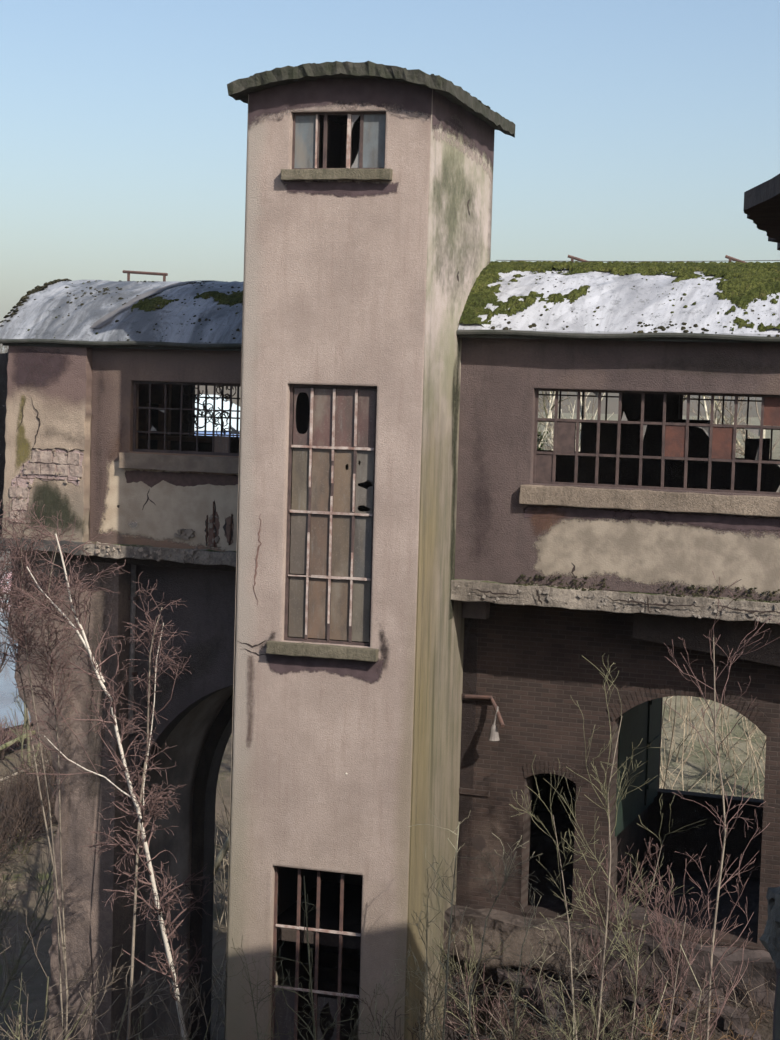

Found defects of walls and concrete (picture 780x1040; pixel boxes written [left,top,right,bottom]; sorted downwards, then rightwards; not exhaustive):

damp [14,349,67,386]
crack [17,398,84,452]
peeling [86,461,239,566]
peeling [535,518,780,623]
crack [238,640,269,656]
damp [262,632,388,684]